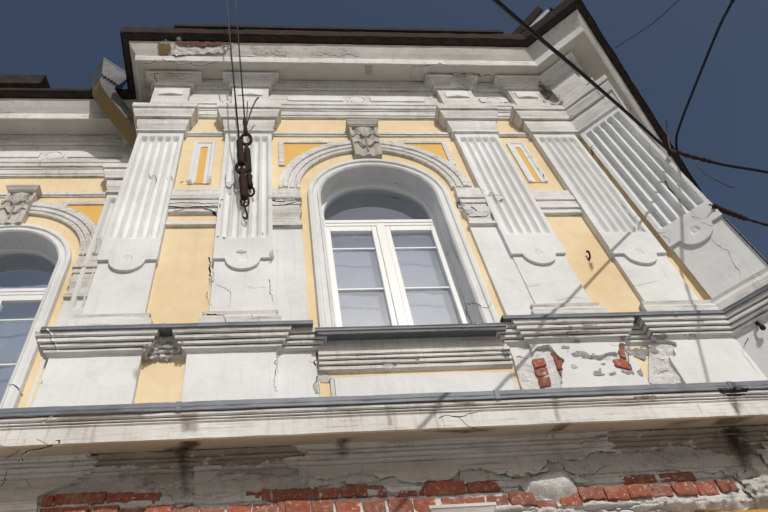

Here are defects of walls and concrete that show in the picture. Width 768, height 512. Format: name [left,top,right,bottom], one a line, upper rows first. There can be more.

spalling [157,37,233,56]
crack [648,143,741,279]
crack [207,285,231,322]
spalling [501,322,682,389]
crack [0,439,61,487]
water stain [168,441,198,460]
spalling [37,425,768,512]
water stain [715,418,747,461]